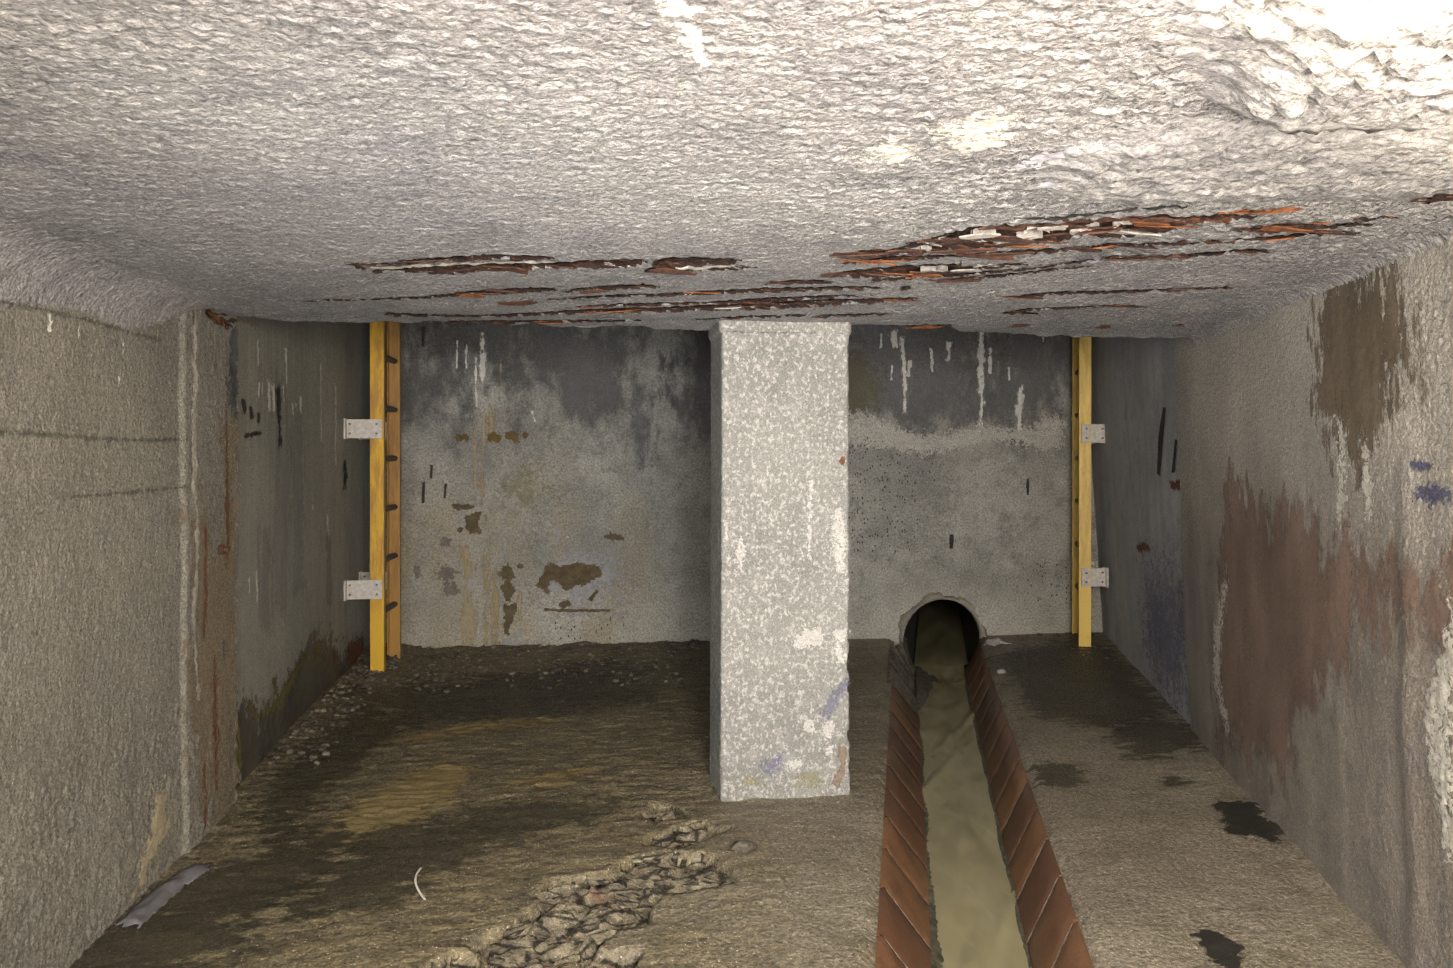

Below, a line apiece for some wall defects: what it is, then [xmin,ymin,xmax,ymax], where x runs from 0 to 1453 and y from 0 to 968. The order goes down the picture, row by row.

spalling [1410,194,1453,204]
spalling [293,207,1398,329]
water stain [668,330,711,441]
water stain [848,324,1072,463]
peeling [497,562,524,636]
peeling [535,561,611,612]